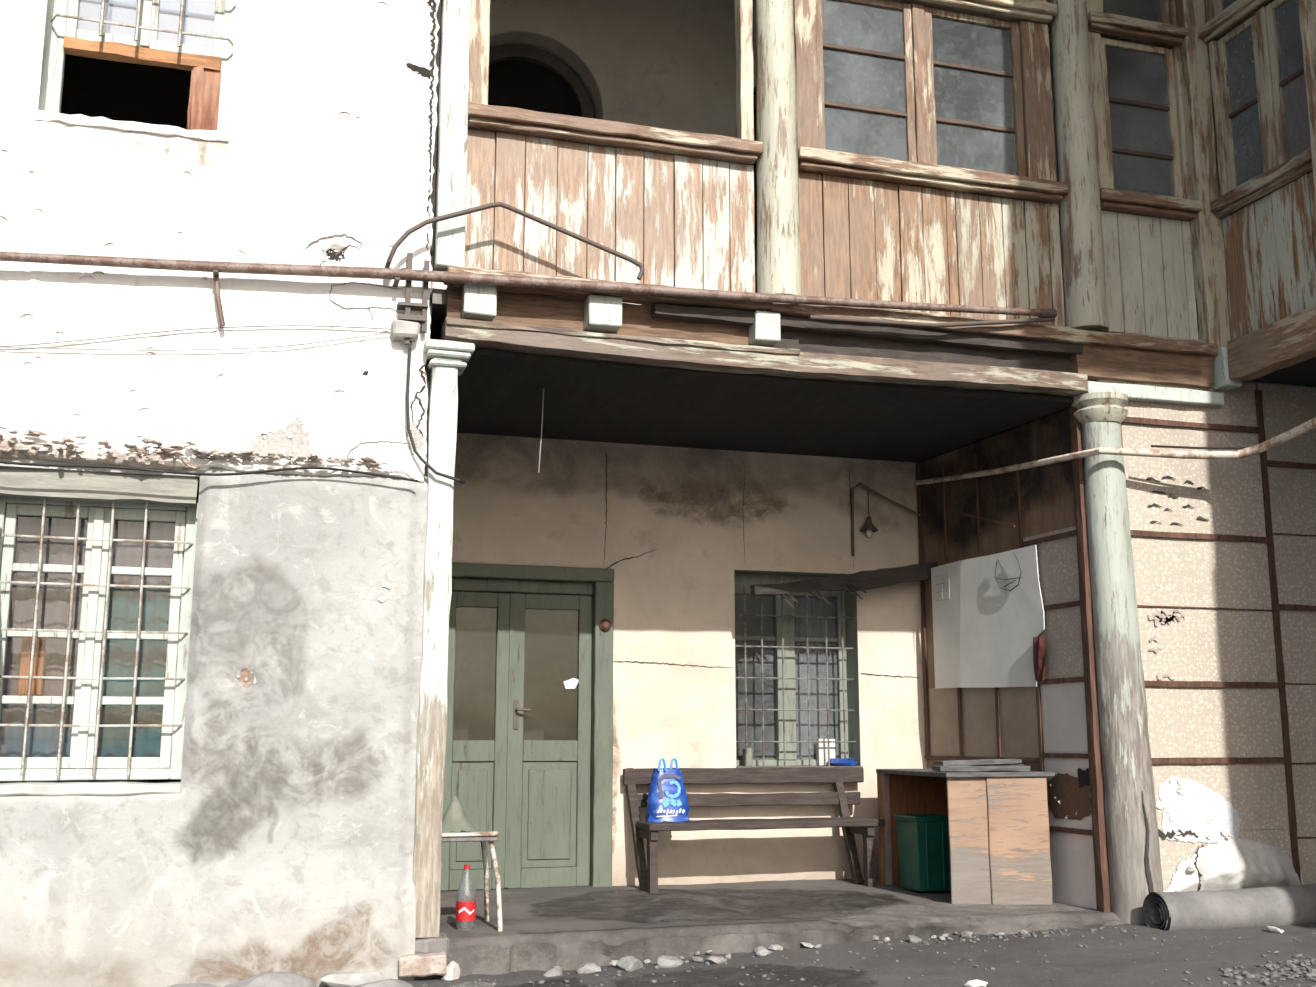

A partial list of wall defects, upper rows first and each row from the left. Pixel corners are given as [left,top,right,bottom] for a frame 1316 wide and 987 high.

peeling [0,417,387,468]
flaking render [1156,777,1307,892]